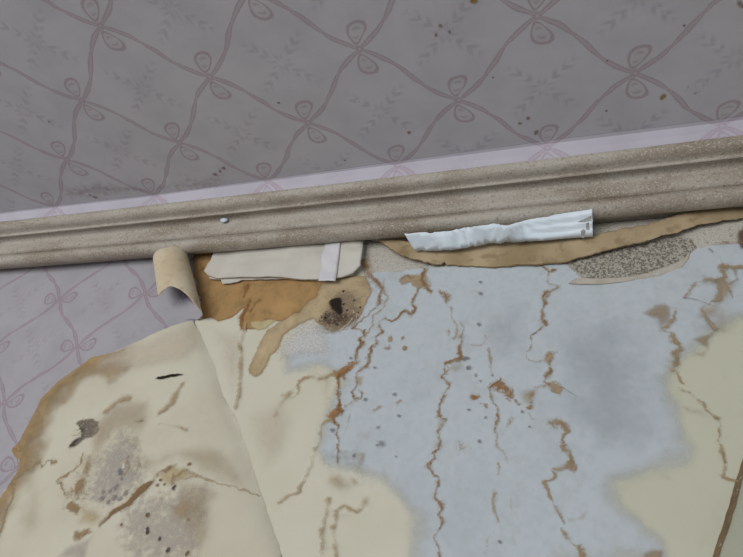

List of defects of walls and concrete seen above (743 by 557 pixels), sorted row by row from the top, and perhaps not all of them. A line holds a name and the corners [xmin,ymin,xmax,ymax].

peeling [568,236,697,285]
water stain [0,336,186,533]
water stain [58,438,202,557]
water stain [192,229,743,557]